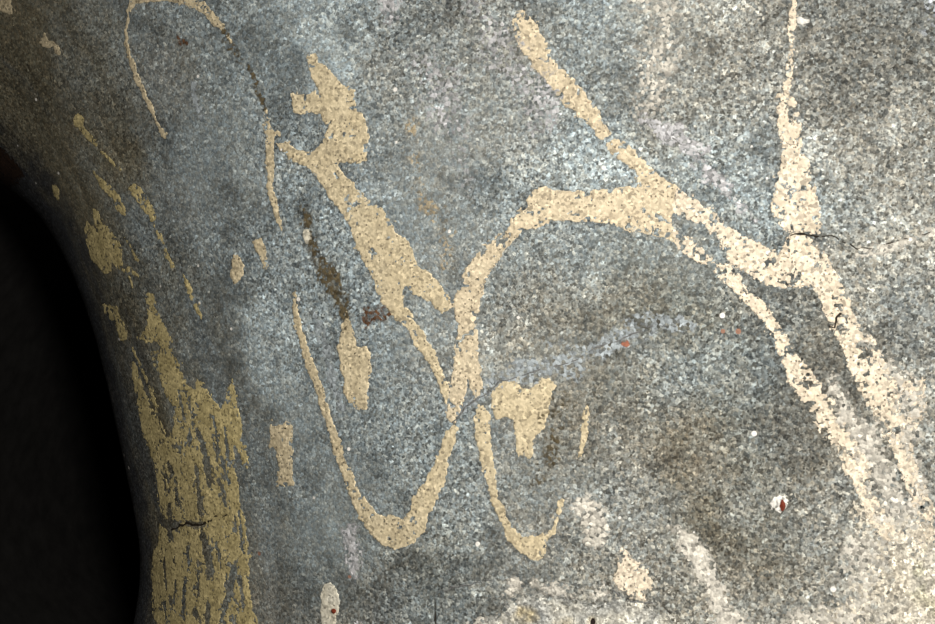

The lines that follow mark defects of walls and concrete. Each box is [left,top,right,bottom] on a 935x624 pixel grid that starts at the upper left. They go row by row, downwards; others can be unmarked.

crack [789,232,930,250]
crack [171,514,227,531]
crack [432,579,492,624]